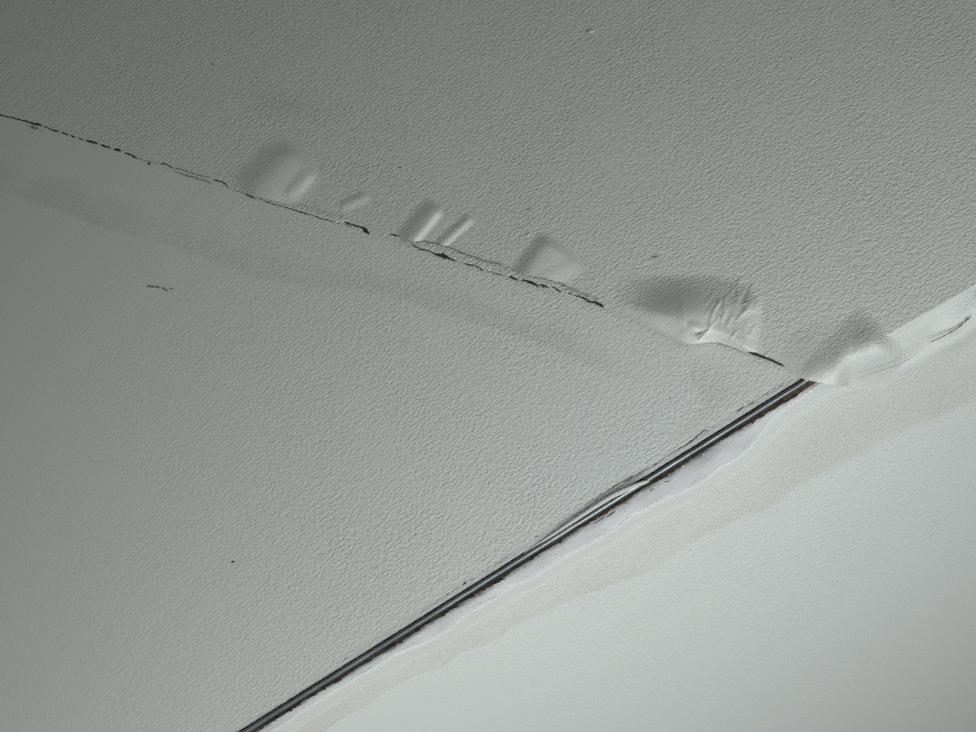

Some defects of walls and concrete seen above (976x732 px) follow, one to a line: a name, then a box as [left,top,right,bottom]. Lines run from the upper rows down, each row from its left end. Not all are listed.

crack [0,114,604,308]
crack [715,342,785,367]
crack [858,316,971,378]